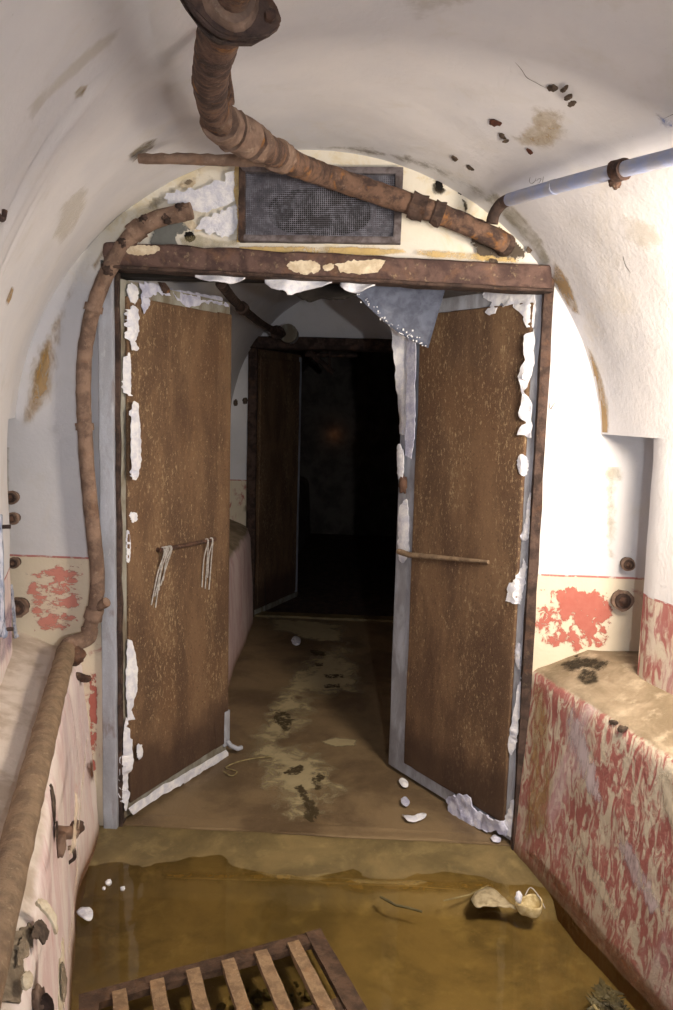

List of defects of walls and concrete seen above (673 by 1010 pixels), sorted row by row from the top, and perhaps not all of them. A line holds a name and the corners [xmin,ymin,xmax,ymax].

flaking render [126,167,405,295]
flaking render [420,238,532,263]
leakage [28,347,51,417]
peeling [26,566,83,631]
peeling [535,587,613,654]
spalling [49,784,58,841]
peeling [70,792,81,853]
spalling [2,898,70,1010]